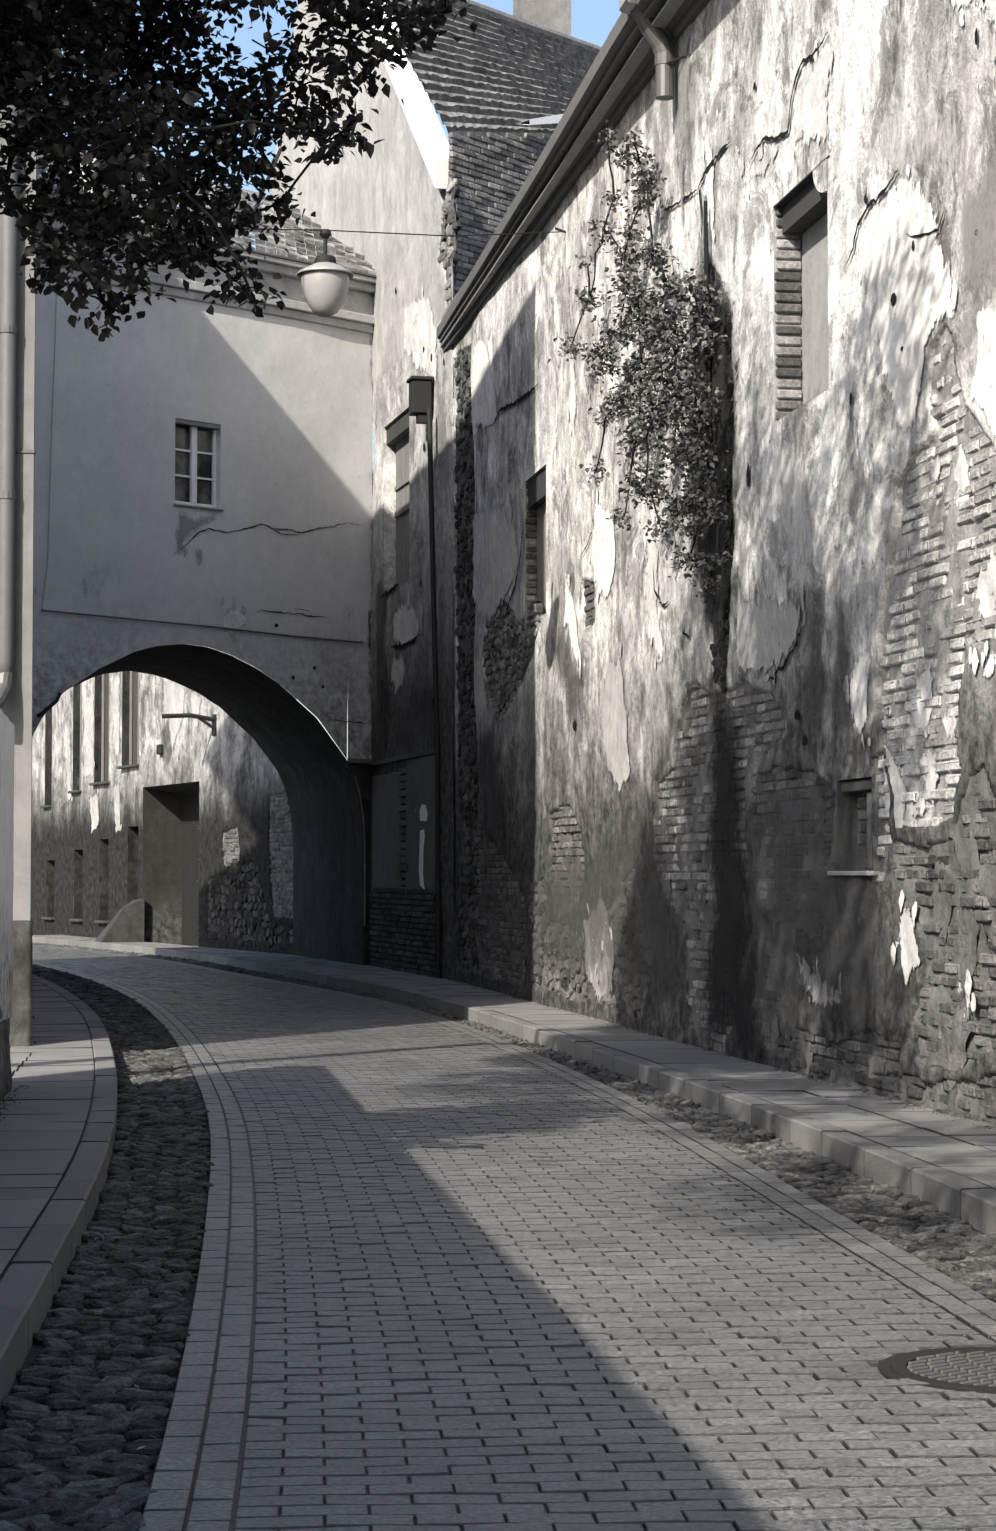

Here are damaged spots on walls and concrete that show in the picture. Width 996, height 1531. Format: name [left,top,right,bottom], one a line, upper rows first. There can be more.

crack [174,522,363,554]
flaking render [395,173,543,974]
flaking render [529,123,806,1054]
crack [663,32,828,243]
water stain [689,245,894,1064]
flaking render [737,164,996,1126]
crack [845,170,898,265]
crack [906,207,945,238]